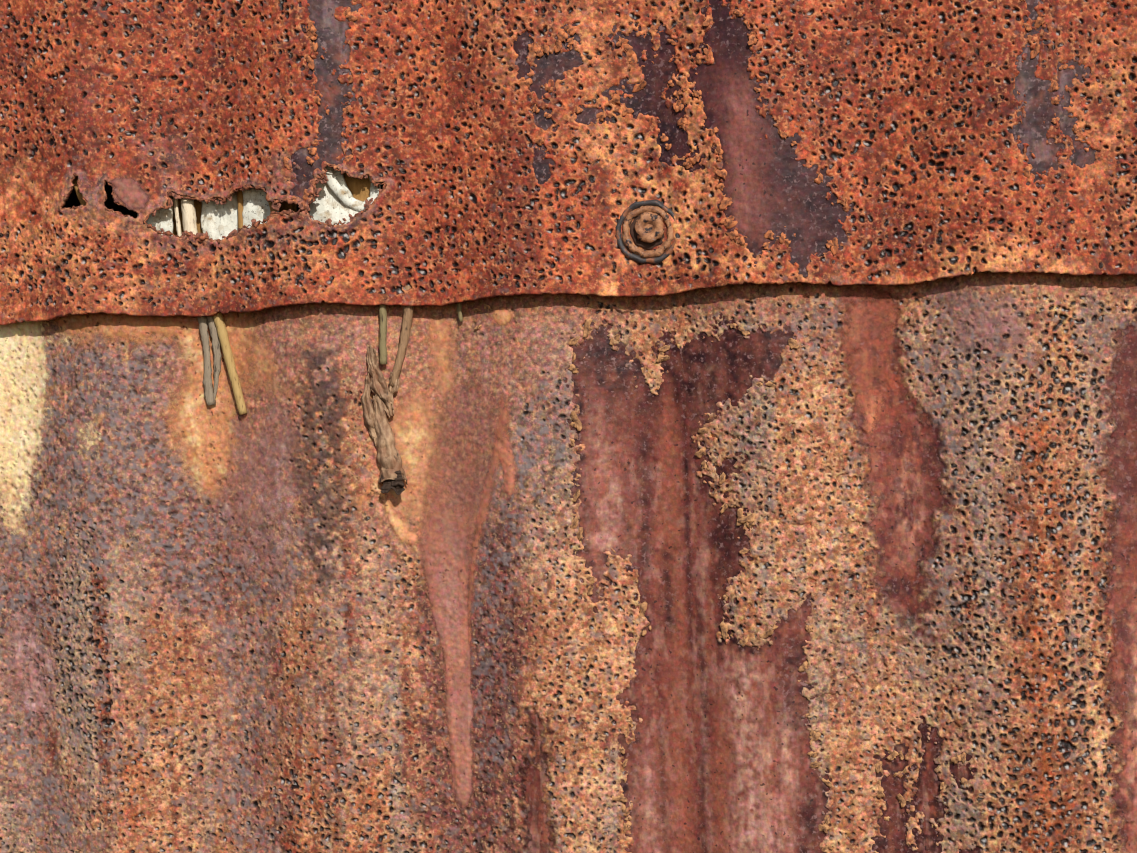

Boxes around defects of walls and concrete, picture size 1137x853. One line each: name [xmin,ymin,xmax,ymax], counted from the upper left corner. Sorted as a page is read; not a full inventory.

rust [110,177,151,210]
rust [279,0,363,201]
peeling [325,189,383,227]
rust [511,24,583,192]
rust [570,0,856,277]
rust [1006,0,1099,189]
rust [55,312,281,492]
rust [838,289,952,642]
rust [356,395,516,809]
rust [563,313,837,853]
rust [1099,325,1137,853]
rust [870,716,950,853]